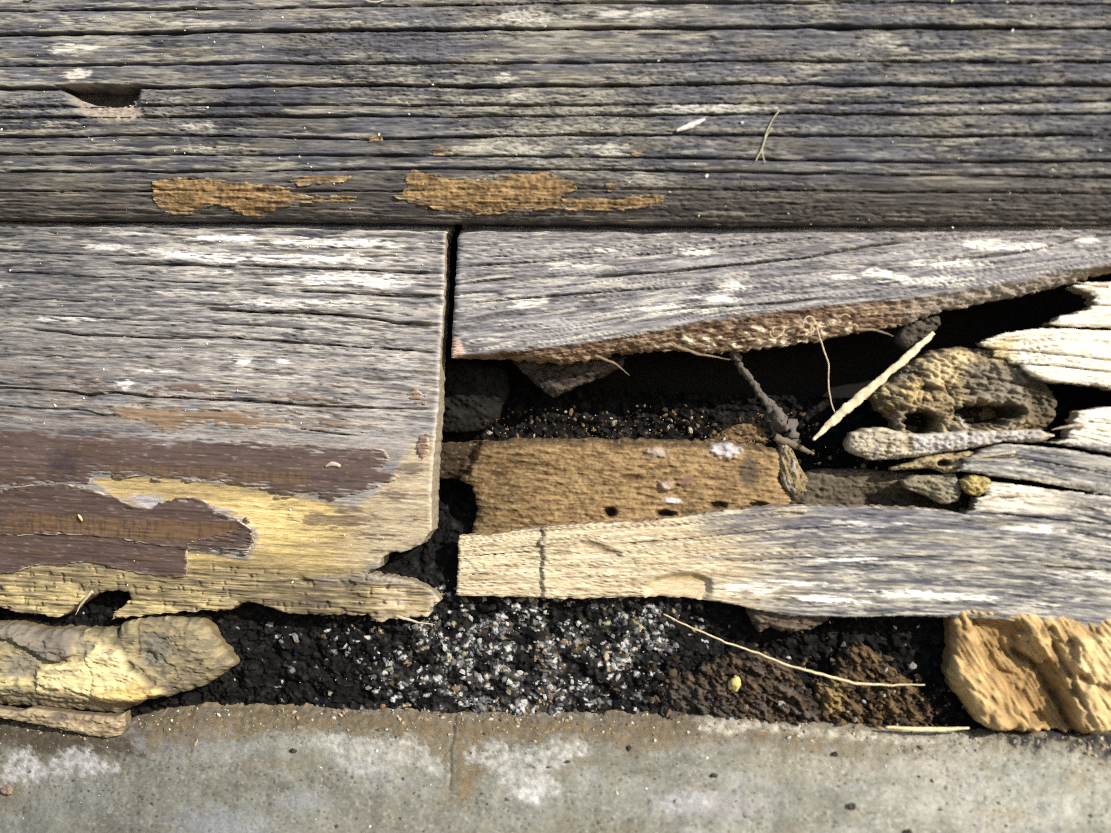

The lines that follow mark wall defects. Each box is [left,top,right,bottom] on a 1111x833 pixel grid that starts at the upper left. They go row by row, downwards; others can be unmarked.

peeling [152,175,356,219]
peeling [393,170,665,216]
crack [994,349,1109,373]
peeling [416,433,429,459]
peeling [0,378,400,577]